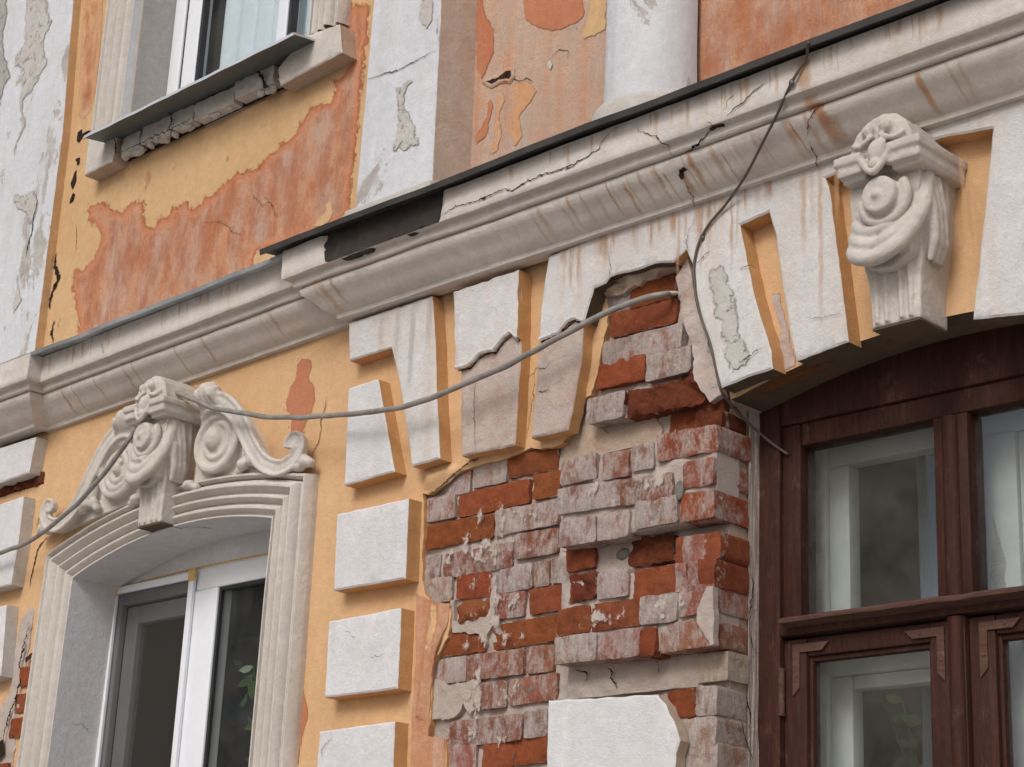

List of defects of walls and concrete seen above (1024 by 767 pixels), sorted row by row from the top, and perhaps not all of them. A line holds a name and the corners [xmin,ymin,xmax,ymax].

peeling [0,0,52,162]
spalling [69,157,80,203]
peeling [71,0,445,335]
peeling [471,0,607,168]
crack [436,84,763,223]
crack [806,102,827,167]
rust [916,76,933,102]
crack [49,227,77,343]
peeling [284,359,315,434]
spalling [0,472,45,497]
spalling [410,258,751,767]
spalling [0,607,35,767]